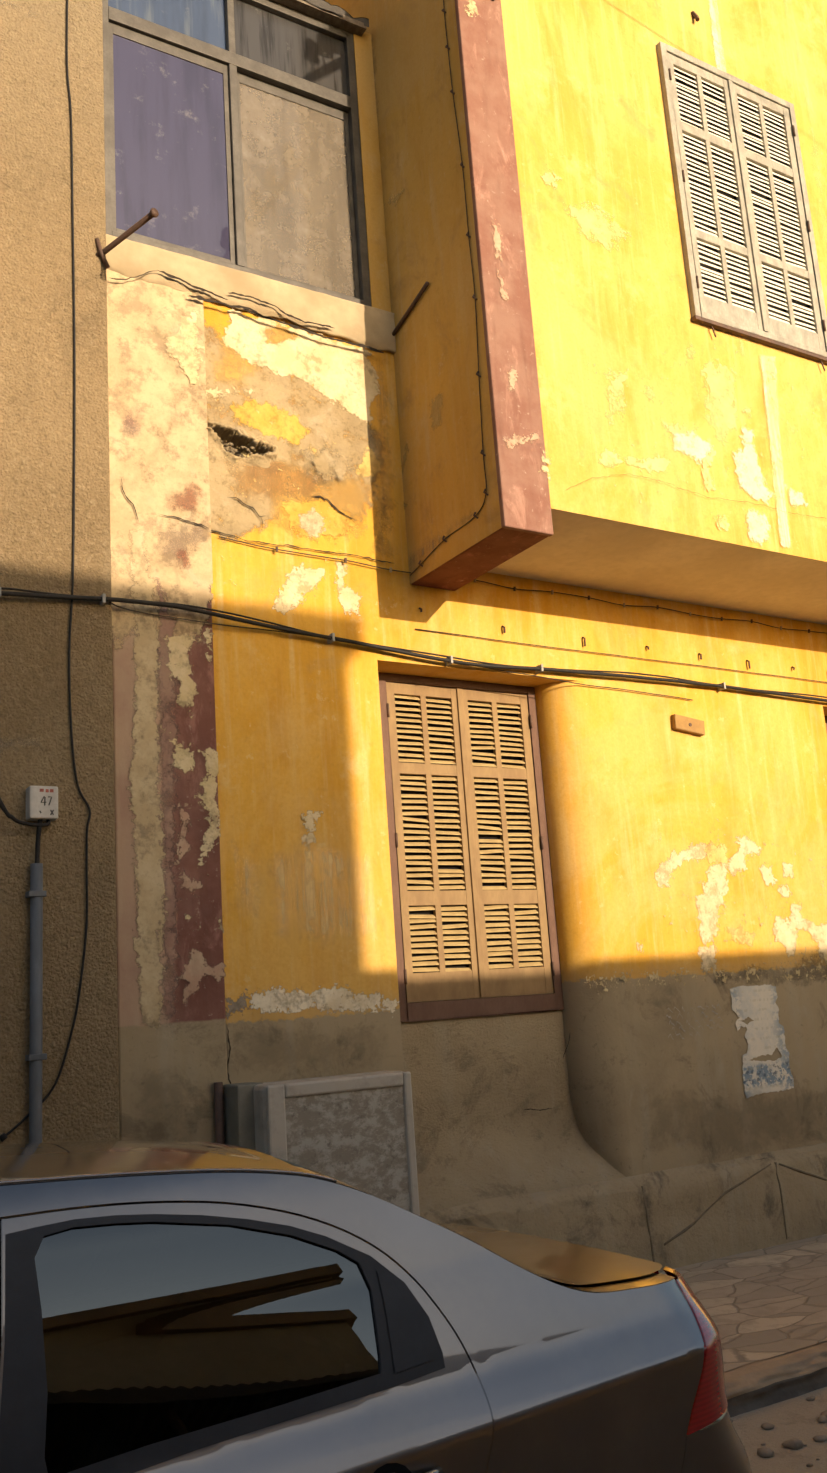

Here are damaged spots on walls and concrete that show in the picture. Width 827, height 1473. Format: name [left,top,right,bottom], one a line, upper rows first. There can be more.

peeling [465,0,479,17]
peeling [541,169,562,189]
peeling [569,203,629,250]
peeling [588,347,826,545]
crack [121,478,391,563]
peeling [106,269,385,1028]
peeling [584,818,827,994]